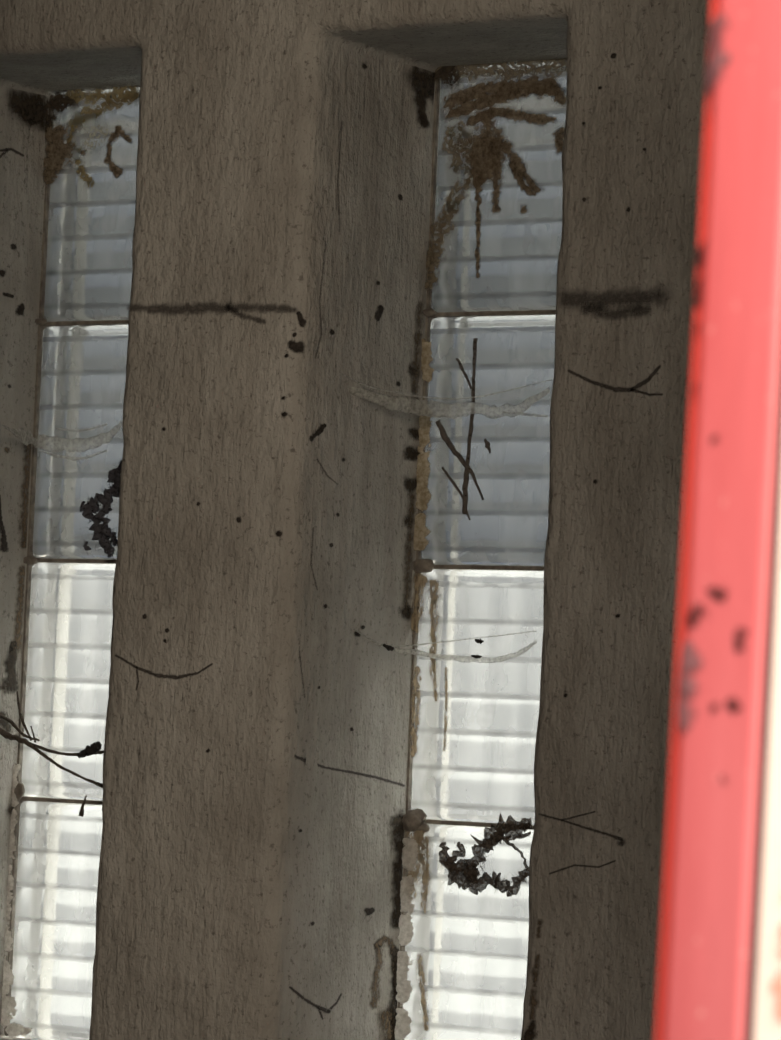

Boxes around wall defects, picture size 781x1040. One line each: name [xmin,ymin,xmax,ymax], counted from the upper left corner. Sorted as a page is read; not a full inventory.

crack [127,122,342,358]
peeling [394,838,419,1040]